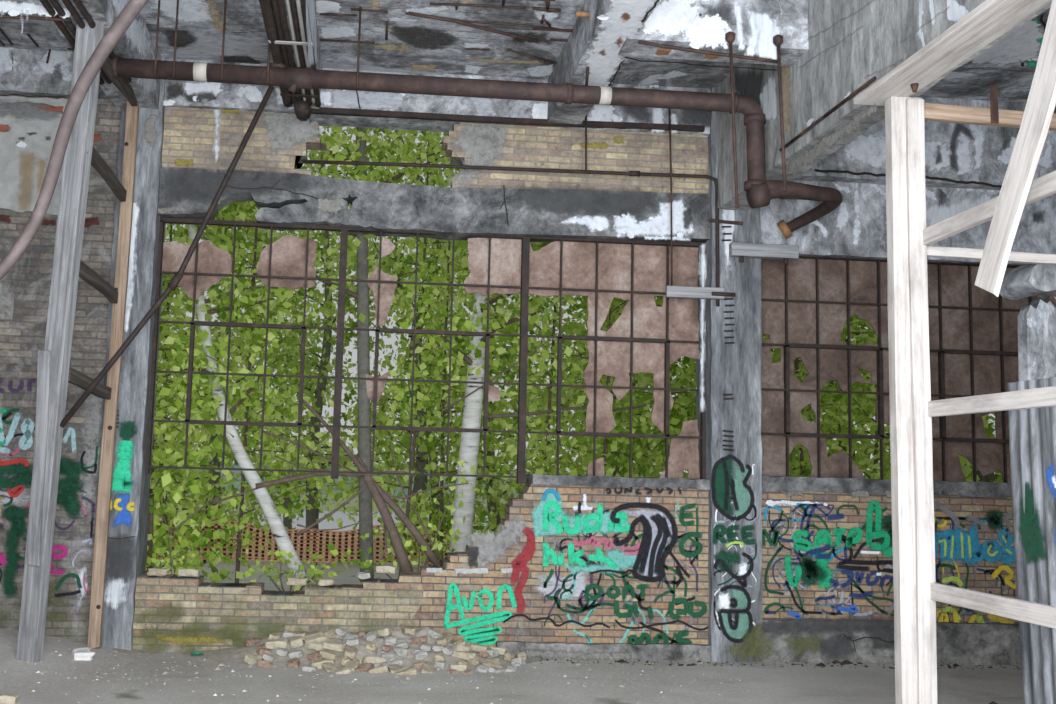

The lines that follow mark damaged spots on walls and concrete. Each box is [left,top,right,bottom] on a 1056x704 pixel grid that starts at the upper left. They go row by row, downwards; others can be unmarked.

peeling [0,0,70,46]
spalling [315,0,573,64]
peeling [582,0,777,86]
spalling [84,217,100,228]
spalling [683,209,693,229]